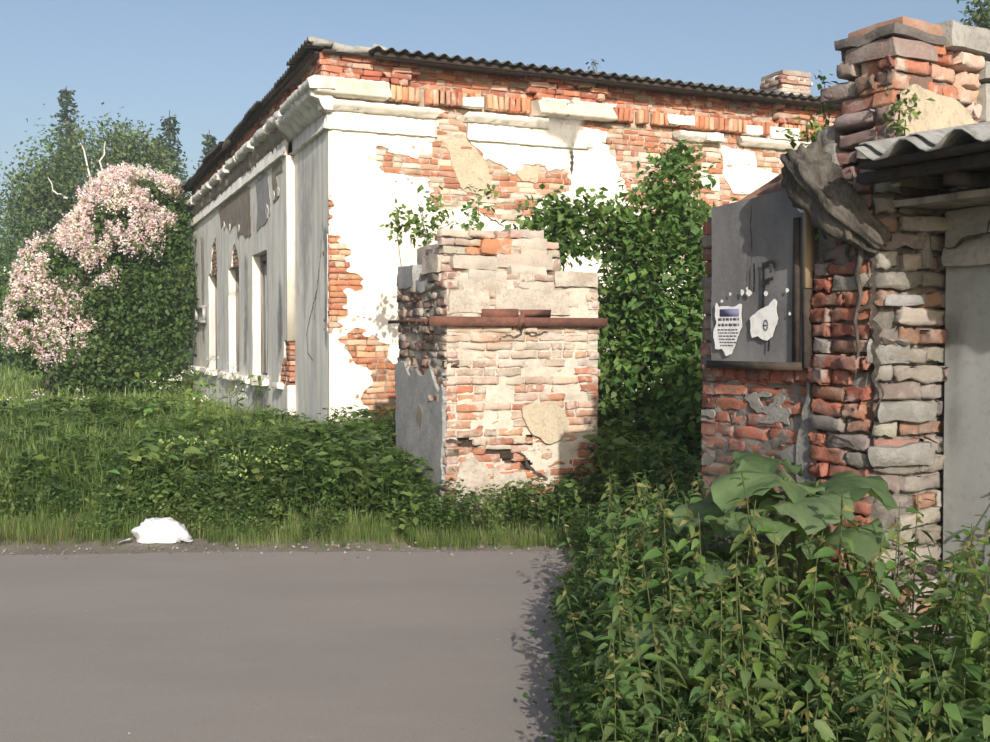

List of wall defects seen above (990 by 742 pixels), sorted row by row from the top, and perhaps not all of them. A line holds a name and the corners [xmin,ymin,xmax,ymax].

peeling [219,160,283,269]
flaking render [368,106,571,224]
flaking render [280,340,295,386]
flaking render [323,195,396,424]
spalling [576,120,820,595]